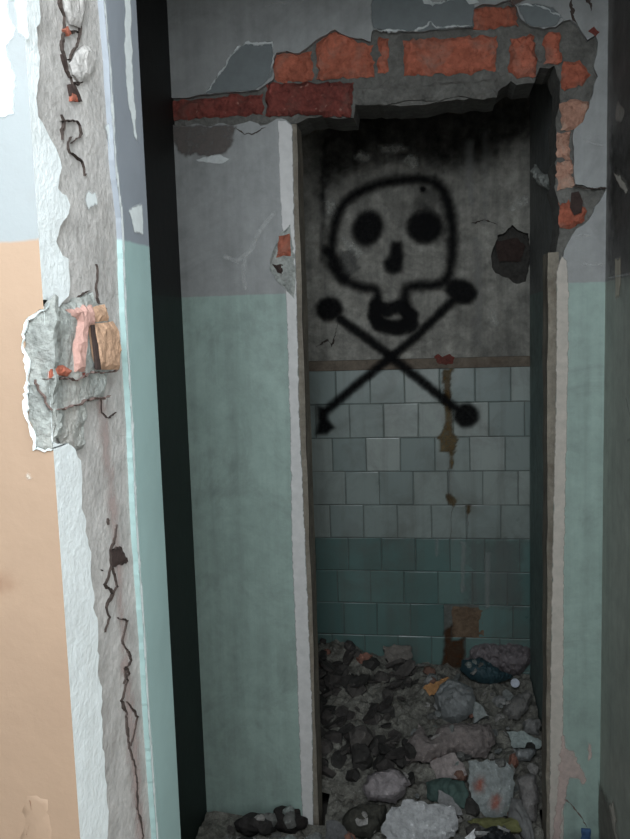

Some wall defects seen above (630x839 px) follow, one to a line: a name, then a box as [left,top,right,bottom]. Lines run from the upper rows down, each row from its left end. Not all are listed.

peeling [0,0,28,117]
crack [57,0,88,176]
crack [569,0,592,25]
crack [76,264,107,309]
flaking render [21,0,158,839]
crack [99,399,117,419]
flaking render [173,0,605,839]
corrosion [437,368,458,468]
crack [100,518,144,839]
peeling [598,785,618,839]